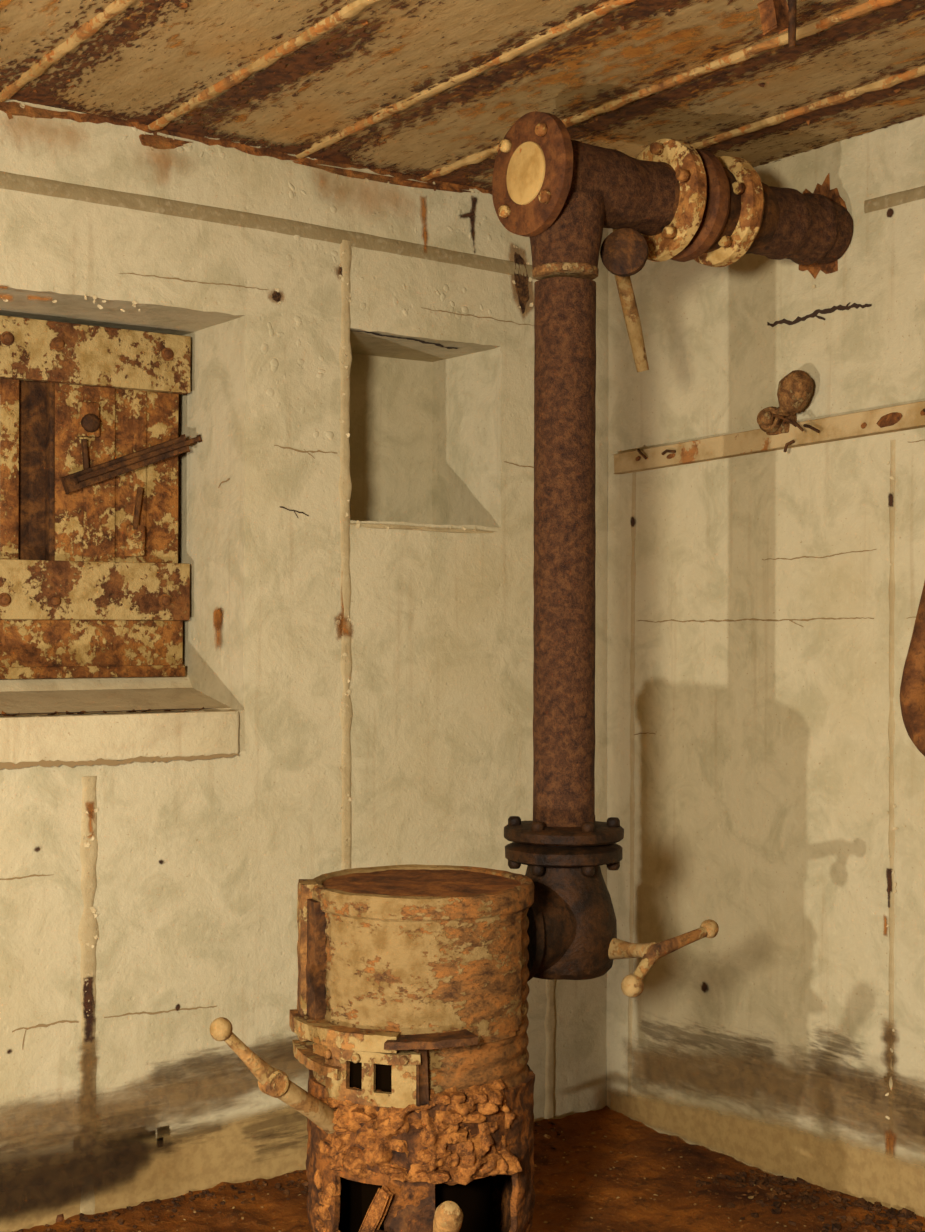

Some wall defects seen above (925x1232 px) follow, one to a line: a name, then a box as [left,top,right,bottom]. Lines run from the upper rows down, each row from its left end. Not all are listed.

corrosion [0,0,925,253]
crack [767,302,872,327]
corrosion [861,412,902,429]
corrosion [213,609,222,646]
corrosion [81,977,96,1150]
damp [0,1059,308,1232]
damp [259,1043,309,1080]
damp [609,1046,925,1217]